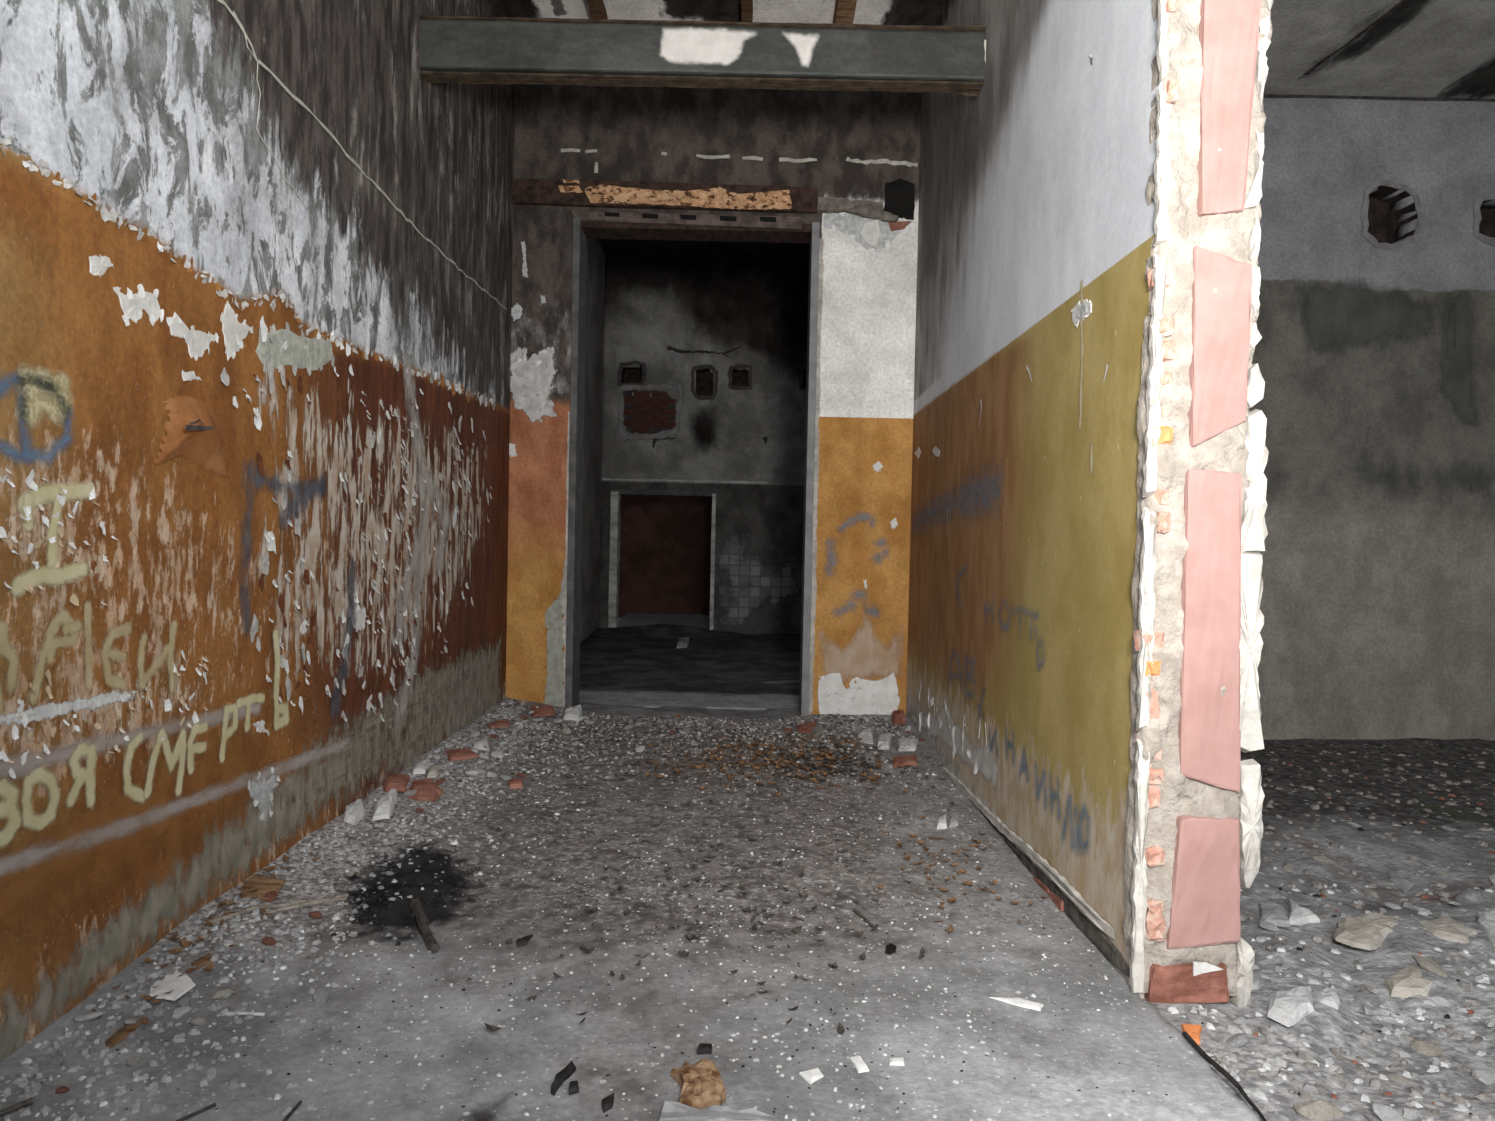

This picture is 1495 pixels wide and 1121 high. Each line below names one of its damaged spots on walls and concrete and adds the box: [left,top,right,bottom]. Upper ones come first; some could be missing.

peeling [551,0,567,16]
spalling [511,303,523,321]
peeling [510,344,558,422]
leakage [1302,282,1476,426]
peeling [0,137,495,722]
spalling [253,720,270,736]